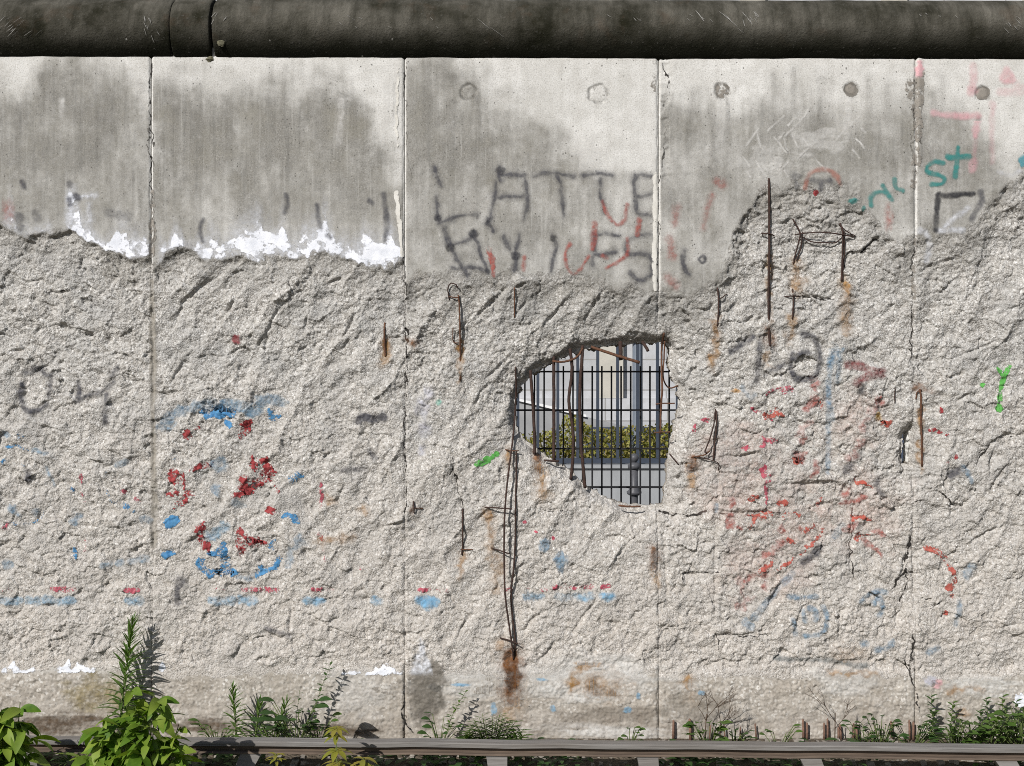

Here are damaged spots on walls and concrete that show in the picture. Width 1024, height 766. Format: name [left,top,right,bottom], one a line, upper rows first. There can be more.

water stain [0,57,611,280]
water stain [627,212,654,292]
corrosion [761,178,775,346]
corrosion [792,219,856,292]
corrosion [447,283,462,362]
spalling [0,166,1024,684]
corrosion [669,409,719,477]
corrosion [914,385,923,466]
corrosion [484,333,678,694]
crack [892,536,911,602]
crack [904,634,922,730]